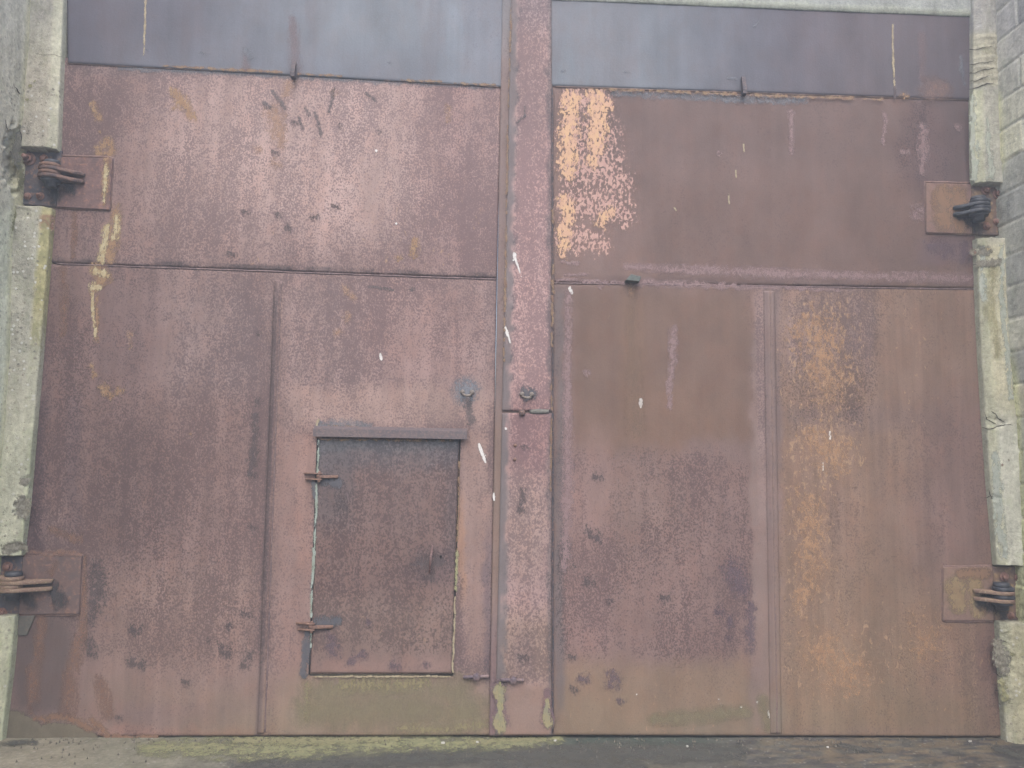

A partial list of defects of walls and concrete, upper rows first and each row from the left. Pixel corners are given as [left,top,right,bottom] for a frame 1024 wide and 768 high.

corrosion [88,101,122,343]
peeling [553,88,637,261]